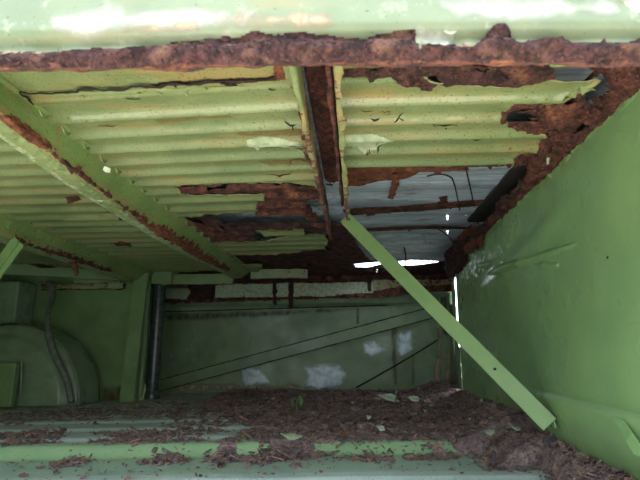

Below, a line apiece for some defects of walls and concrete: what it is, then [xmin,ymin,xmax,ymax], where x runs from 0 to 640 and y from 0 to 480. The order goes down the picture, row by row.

rust [0,13,640,309]